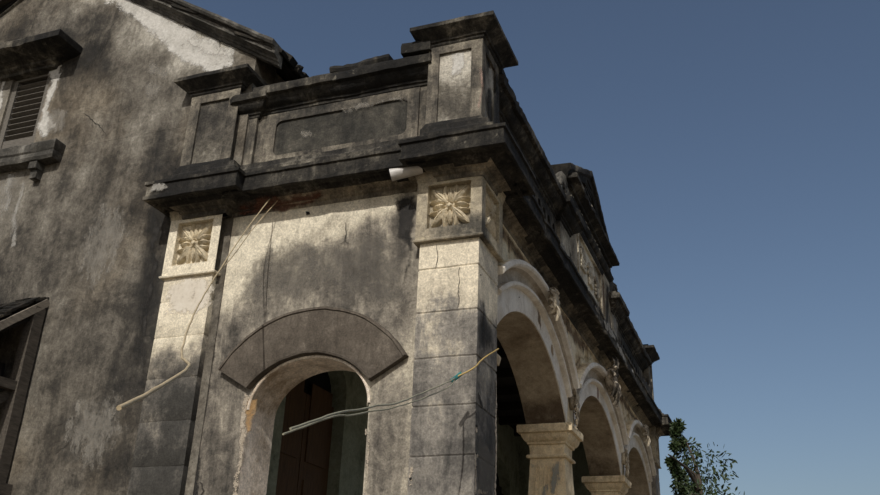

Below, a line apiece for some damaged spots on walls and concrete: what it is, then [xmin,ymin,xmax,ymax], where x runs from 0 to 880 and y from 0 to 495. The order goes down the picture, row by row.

peeling [106,0,234,72]
damp [38,65,62,137]
damp [397,196,417,245]
damp [482,305,491,345]
damp [561,313,591,354]